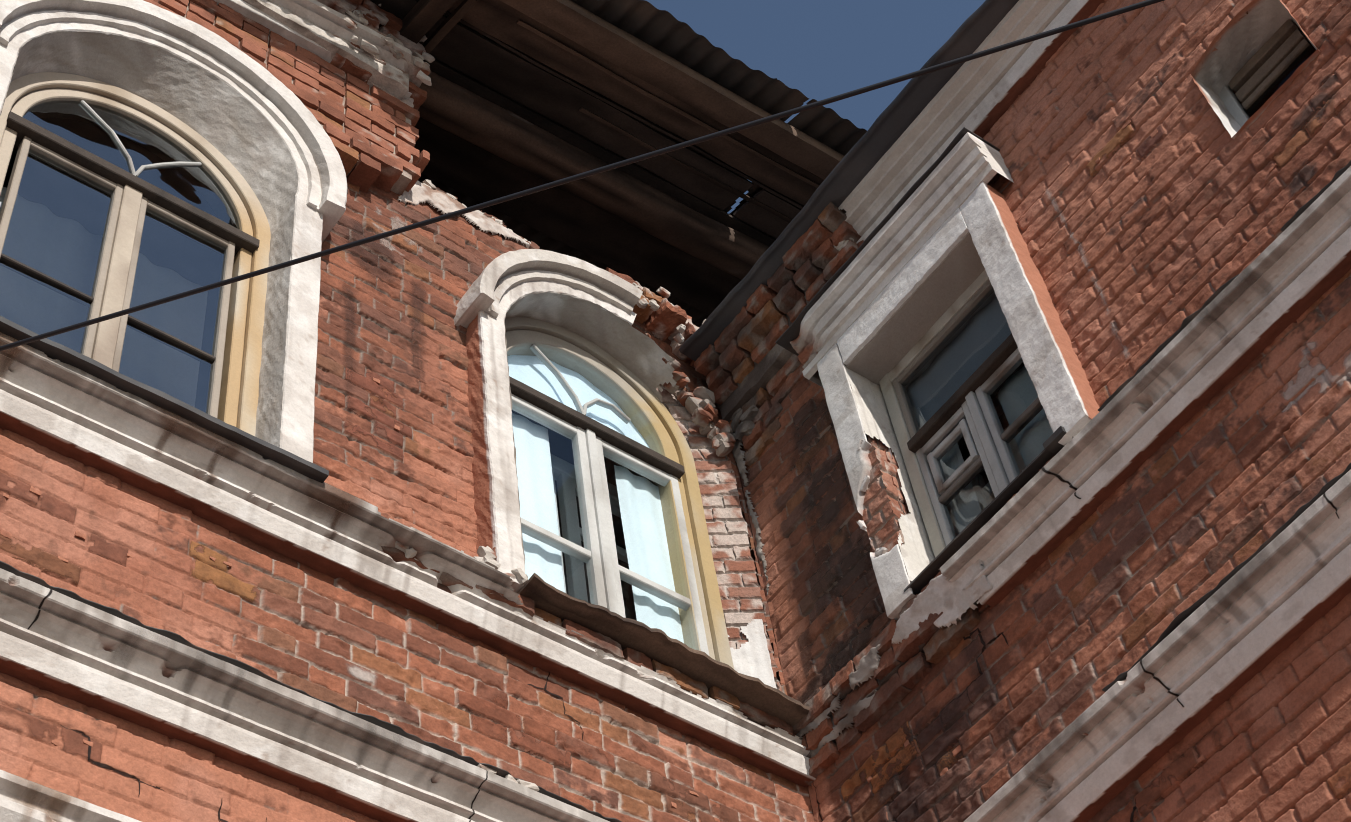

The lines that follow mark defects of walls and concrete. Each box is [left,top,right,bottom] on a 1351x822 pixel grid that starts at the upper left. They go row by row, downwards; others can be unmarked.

spalling [398,179,531,248]
flaking render [656,324,781,691]
flaking render [857,436,909,557]
crack [1041,467,1081,499]
crack [28,589,52,630]
flaking render [381,541,993,786]
crack [1140,659,1184,707]
crack [61,725,164,795]
crack [468,770,488,822]
flaking render [477,763,539,791]